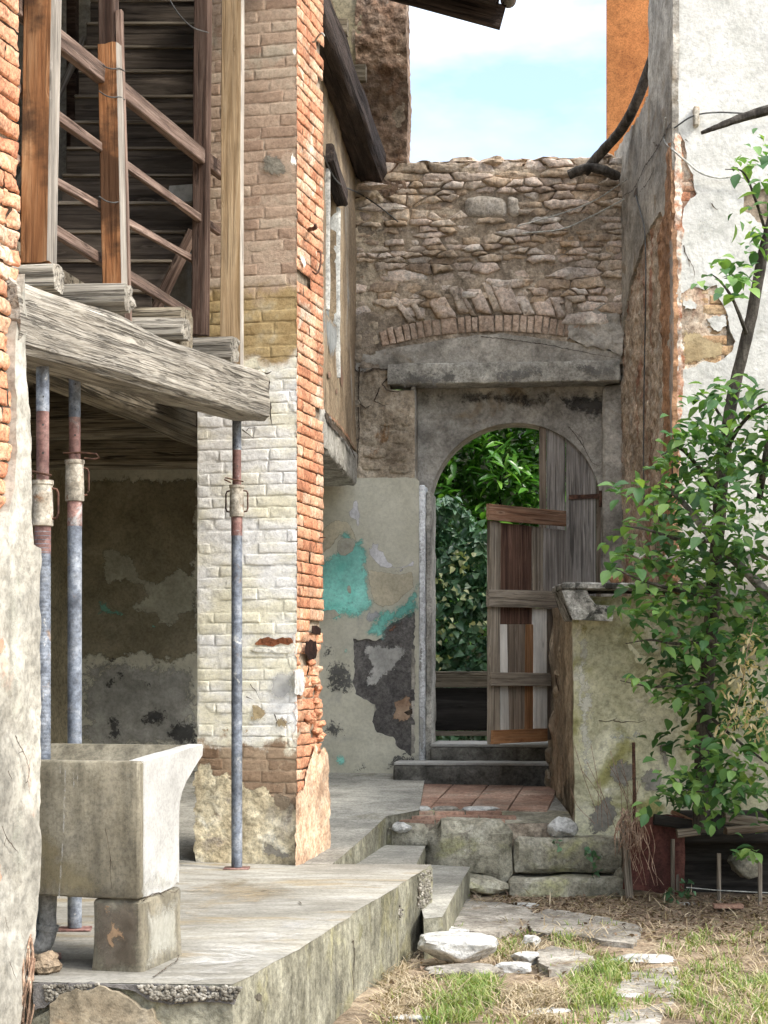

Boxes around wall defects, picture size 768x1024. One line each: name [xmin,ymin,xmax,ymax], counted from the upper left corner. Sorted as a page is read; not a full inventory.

flaking render [657,134,733,596]
leakage [82,658,197,745]
spalling [246,501,424,755]
spalling [264,844,291,859]